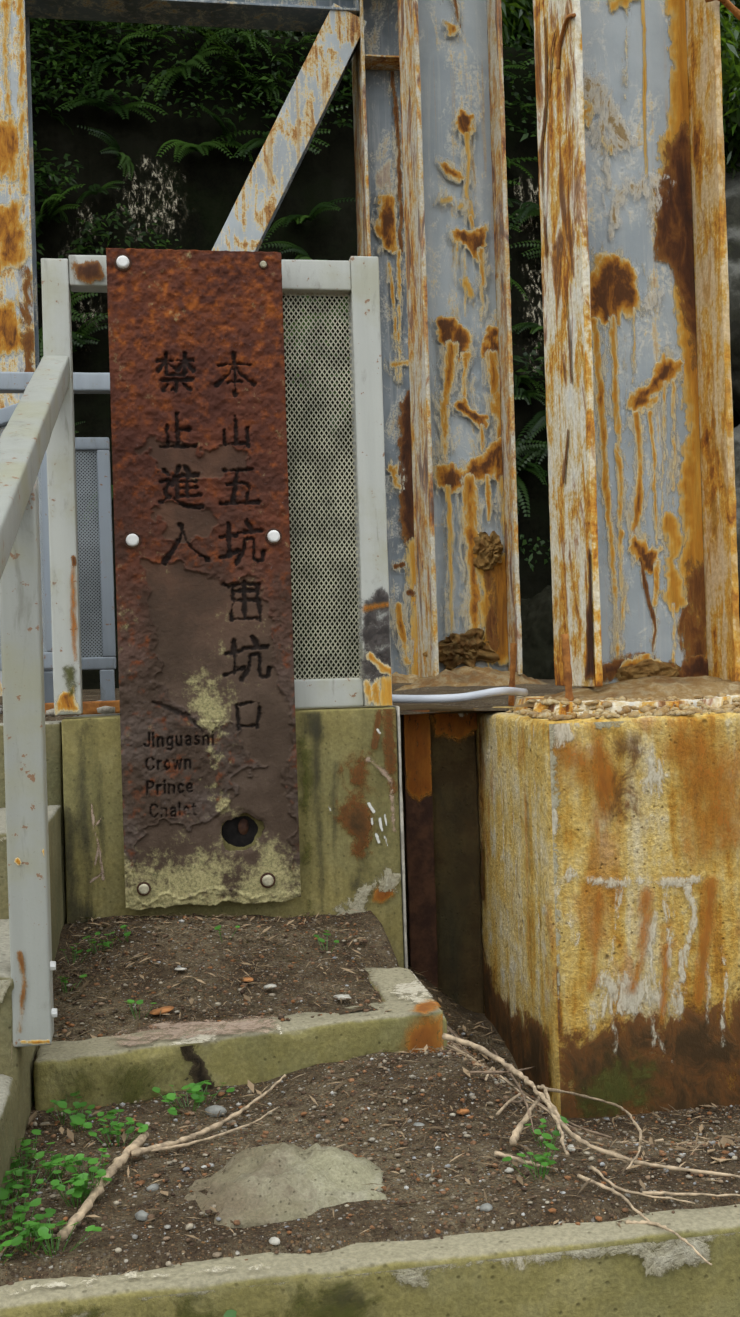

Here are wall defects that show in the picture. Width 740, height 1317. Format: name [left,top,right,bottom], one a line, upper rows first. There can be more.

rust [0,0,35,372]
rust [442,0,463,38]
rust [540,17,557,257]
rust [336,71,432,859]
rust [428,105,509,667]
rust [584,0,708,682]
rust [553,737,617,837]
crack [180,1045,217,1091]
water stain [482,866,740,1119]
rust [630,888,652,991]
rust [660,944,668,1025]
rust [694,877,717,1006]